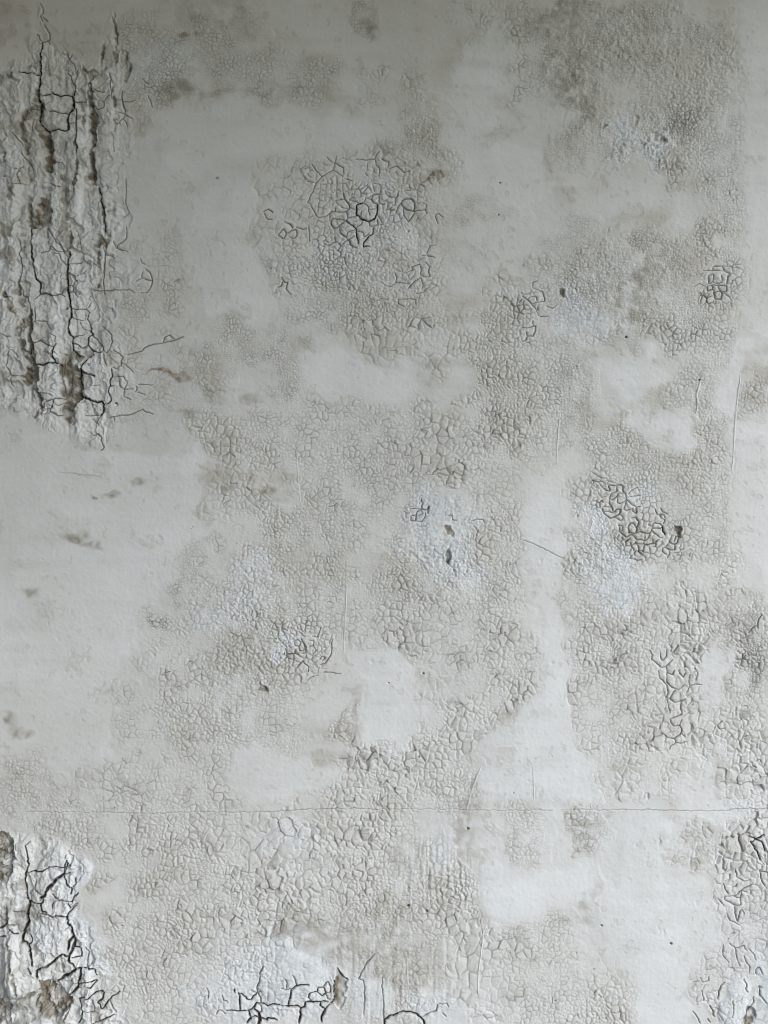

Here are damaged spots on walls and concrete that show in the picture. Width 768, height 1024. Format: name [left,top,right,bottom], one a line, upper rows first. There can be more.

crack [12,4,153,187]
crack [0,189,182,451]
crack [263,152,444,307]
crack [694,266,732,301]
crack [410,499,485,535]
crack [598,485,678,561]
crack [294,627,341,681]
crack [650,650,700,747]
crack [0,842,119,1024]
flaking render [0,831,129,1024]
crack [208,954,448,1024]
crack [489,808,768,1023]